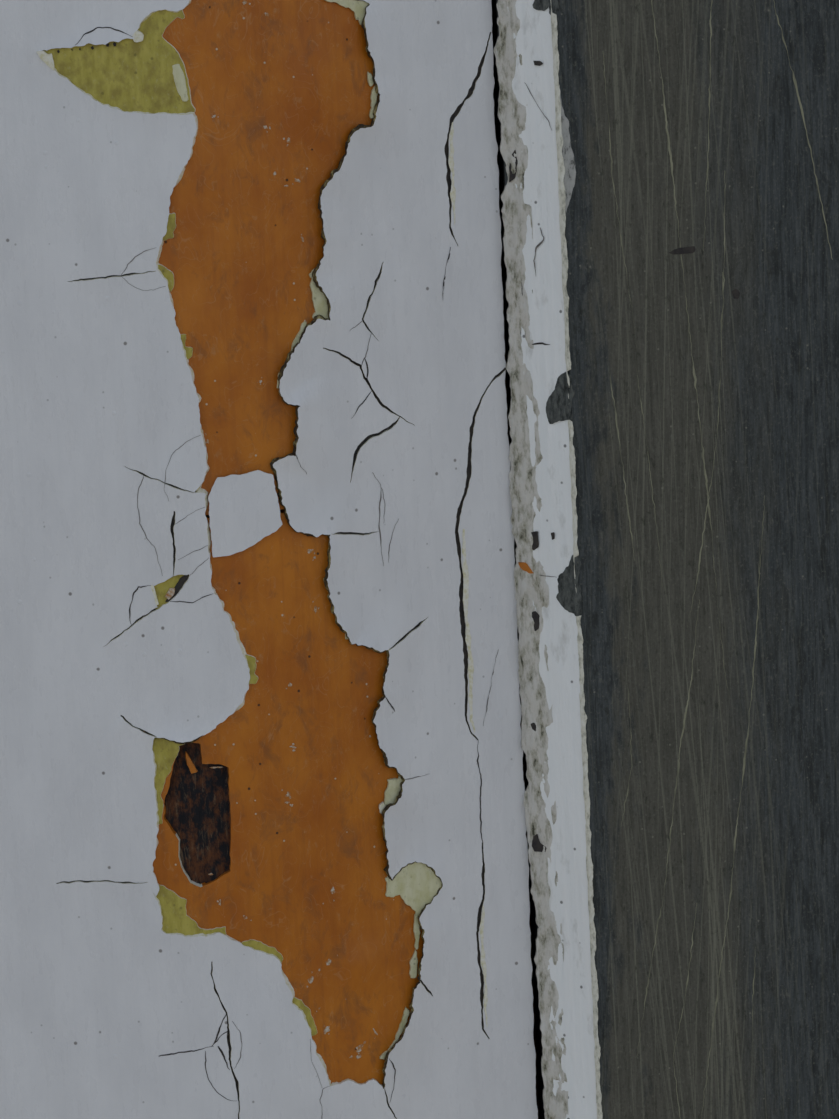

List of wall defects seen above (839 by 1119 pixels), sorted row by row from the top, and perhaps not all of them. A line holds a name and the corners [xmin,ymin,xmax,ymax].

peeling [533,0,559,15]
crack [443,32,491,290]
crack [325,265,410,566]
peeling [546,372,574,424]
crack [110,435,211,641]
peeling [36,0,442,1084]
crack [390,620,424,649]
crack [455,368,506,1038]
spalling [532,611,540,631]
spalling [531,531,555,550]
peeling [556,555,582,616]
crack [160,962,242,1119]